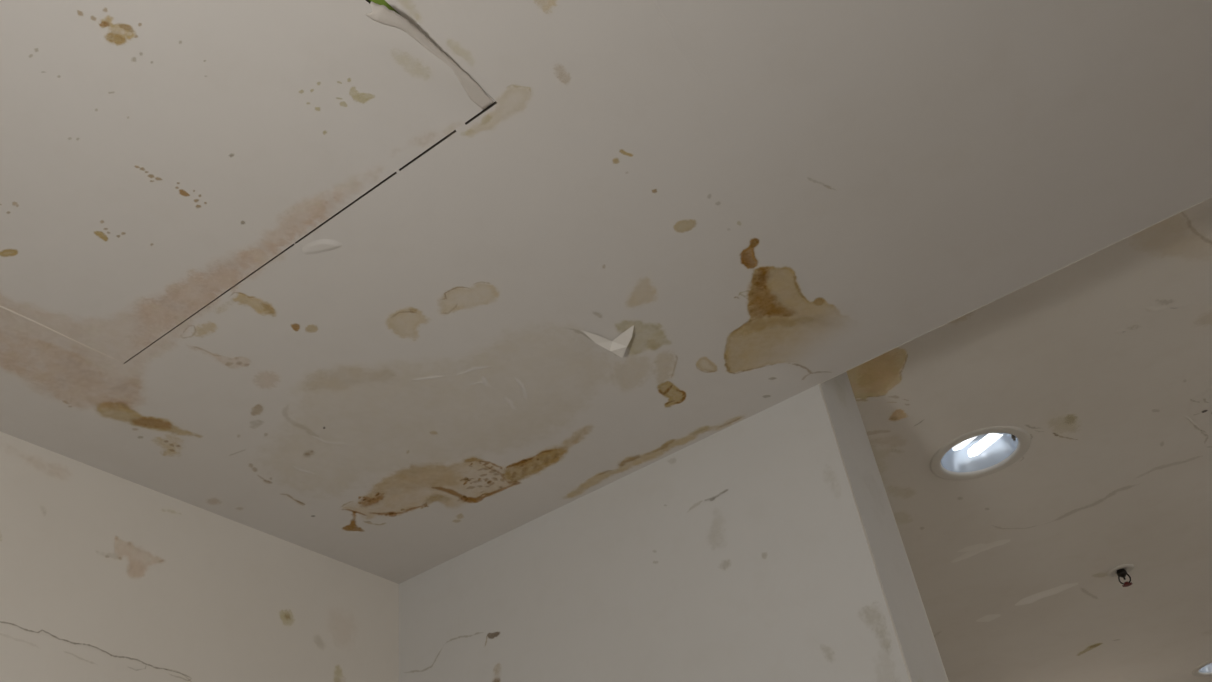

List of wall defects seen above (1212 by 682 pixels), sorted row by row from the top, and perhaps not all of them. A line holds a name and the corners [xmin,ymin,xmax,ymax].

peeling [582,325,634,358]